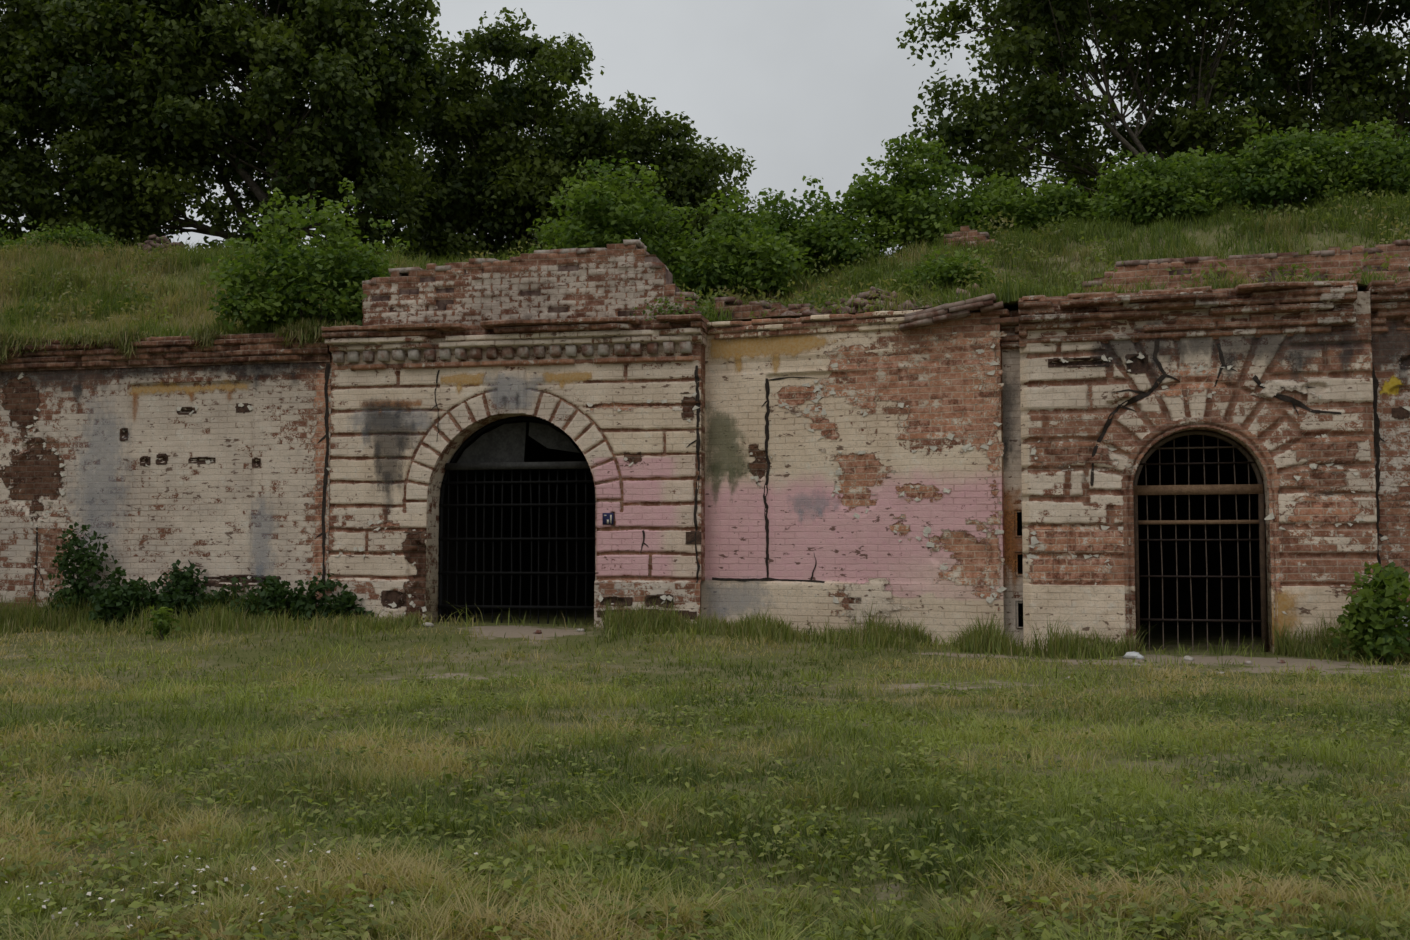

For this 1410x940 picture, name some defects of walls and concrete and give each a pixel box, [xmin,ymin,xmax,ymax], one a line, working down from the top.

spalling [1399,355,1410,369]
spalling [1391,406,1410,419]
peeling [0,372,79,602]
peeling [771,330,1007,611]
peeling [1030,439,1119,471]
peeling [1025,522,1131,585]
peeling [1264,433,1410,633]
peeling [828,583,862,618]